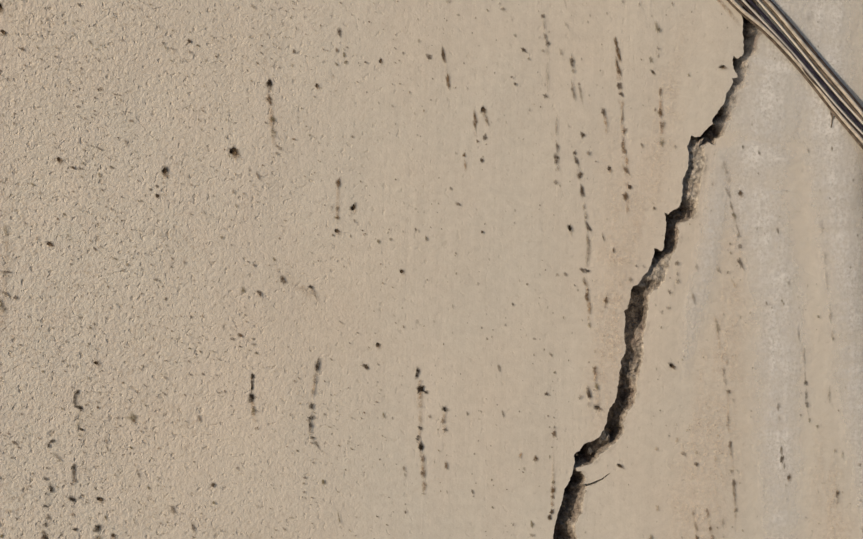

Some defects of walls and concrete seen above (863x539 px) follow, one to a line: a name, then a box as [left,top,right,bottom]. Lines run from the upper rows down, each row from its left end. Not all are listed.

crack [553,0,763,539]